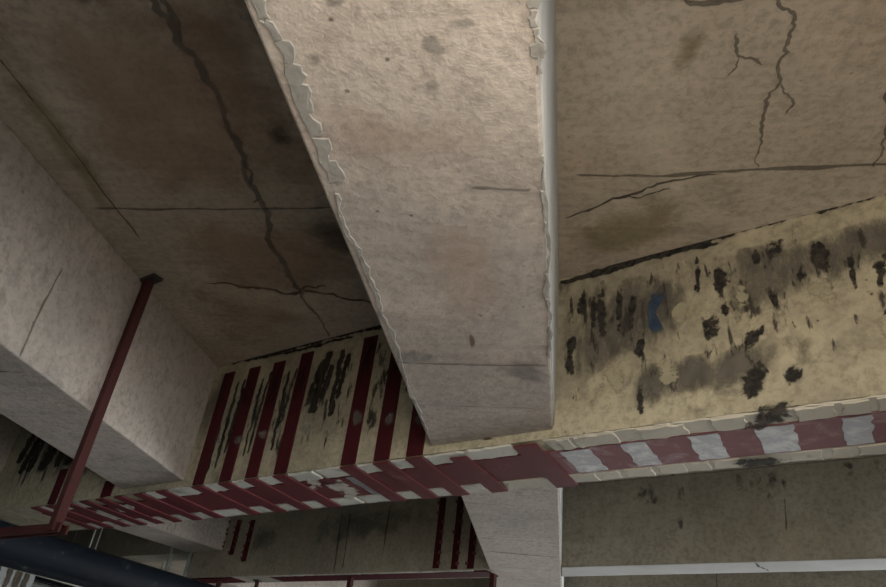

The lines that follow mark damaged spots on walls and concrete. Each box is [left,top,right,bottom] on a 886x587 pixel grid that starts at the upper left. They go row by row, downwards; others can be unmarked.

crack [684,0,742,8]
crack [728,0,797,167]
crack [150,0,382,365]
crack [567,173,719,218]
crack [873,127,886,167]
crack [560,197,874,284]
leakage [735,224,886,309]
leakage [577,280,683,371]
leakage [638,347,769,402]
flaking render [0,566,30,587]